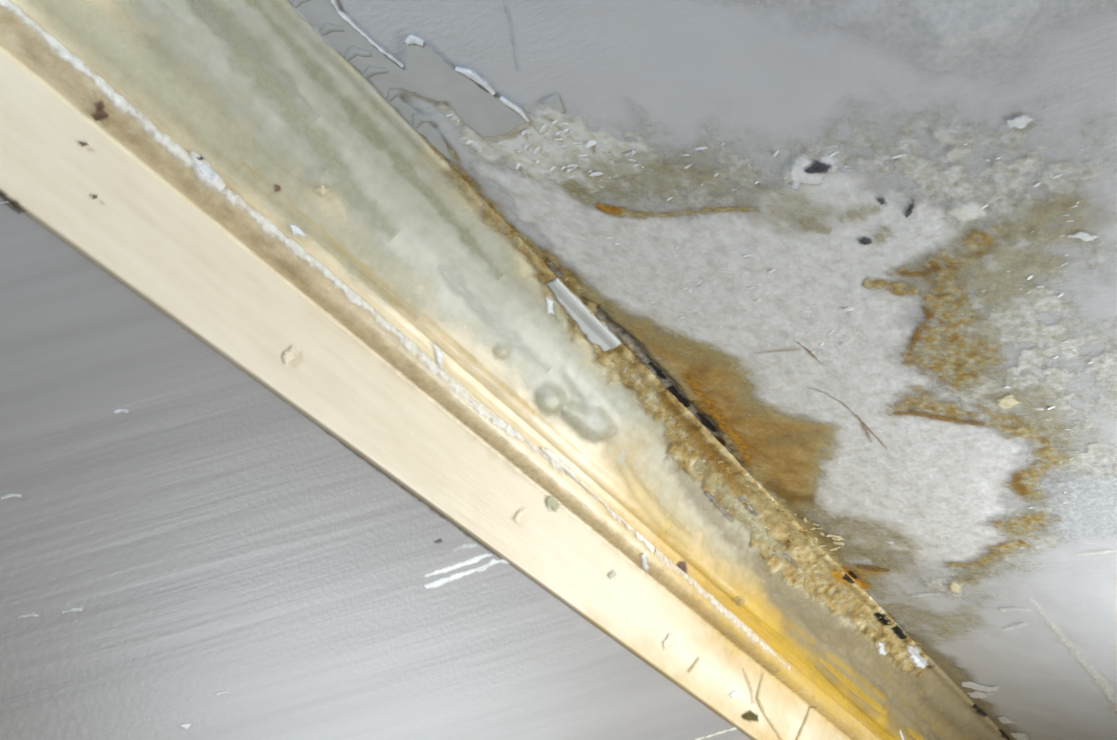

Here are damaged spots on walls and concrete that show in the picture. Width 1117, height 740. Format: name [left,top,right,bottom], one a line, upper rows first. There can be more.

peeling [0,0,791,669]
damp [30,0,810,609]
crack [546,261,563,277]
crack [595,307,753,478]
spalling [289,0,1117,677]
damp [1032,474,1117,538]
damp [660,530,1017,740]